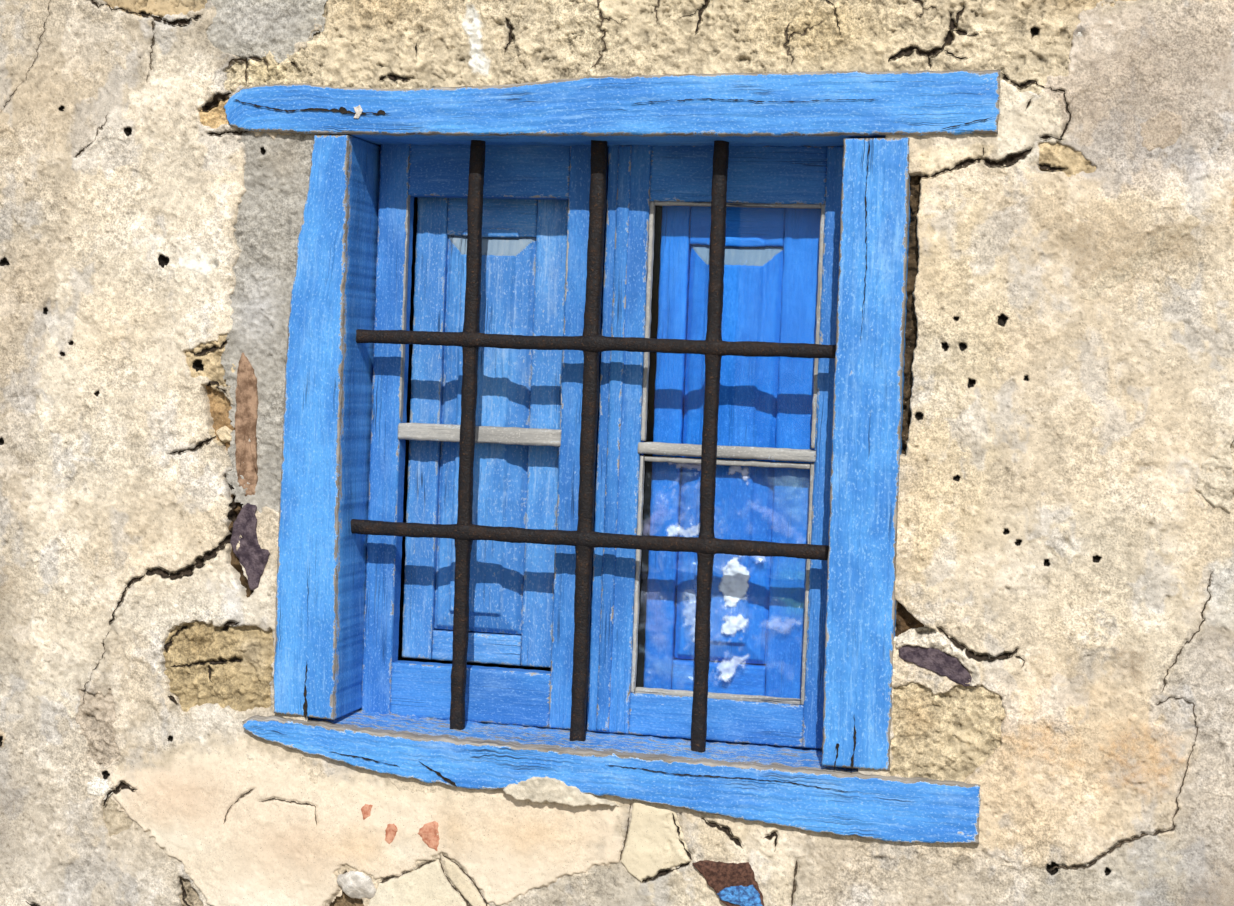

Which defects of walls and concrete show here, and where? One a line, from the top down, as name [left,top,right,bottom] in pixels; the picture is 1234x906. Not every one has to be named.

crack [504,18,514,55]
crack [591,0,708,68]
crack [783,0,841,66]
crack [888,0,978,67]
crack [920,72,1071,179]
crack [83,495,243,704]
spalling [163,621,275,712]
spalling [890,625,1006,782]
crack [1051,571,1213,870]
peeling [75,689,691,906]